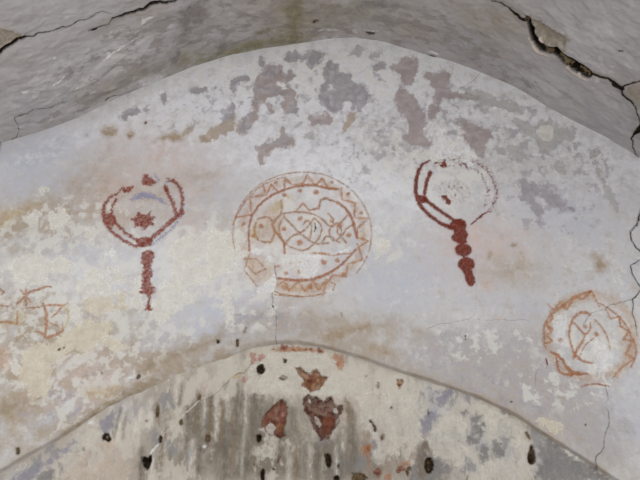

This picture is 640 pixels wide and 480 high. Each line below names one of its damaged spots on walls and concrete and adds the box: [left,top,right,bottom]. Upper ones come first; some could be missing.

crack [0,0,176,53]
peeling [121,106,149,120]
peeling [255,127,294,165]
peeling [200,50,369,142]
peeling [370,52,574,157]
crack [491,0,640,157]
crack [619,214,640,328]
spalling [257,400,288,442]
spalling [296,367,343,441]